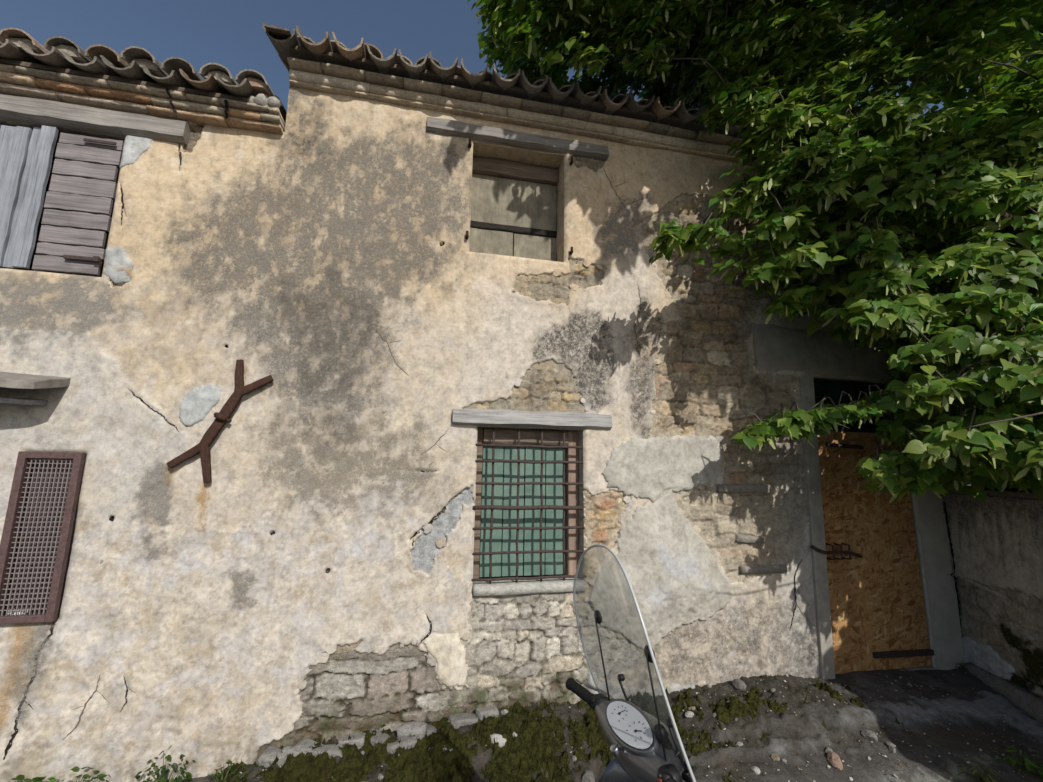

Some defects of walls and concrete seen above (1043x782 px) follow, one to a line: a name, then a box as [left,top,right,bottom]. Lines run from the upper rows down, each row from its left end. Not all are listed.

water stain [168,86,472,516]
spalling [512,258,607,306]
crack [129,389,179,432]
spalling [455,359,589,413]
water stain [533,312,615,408]
spalling [632,194,808,584]
spalling [255,485,639,761]
crack [790,560,804,629]
crack [3,622,54,760]
crack [65,675,135,738]